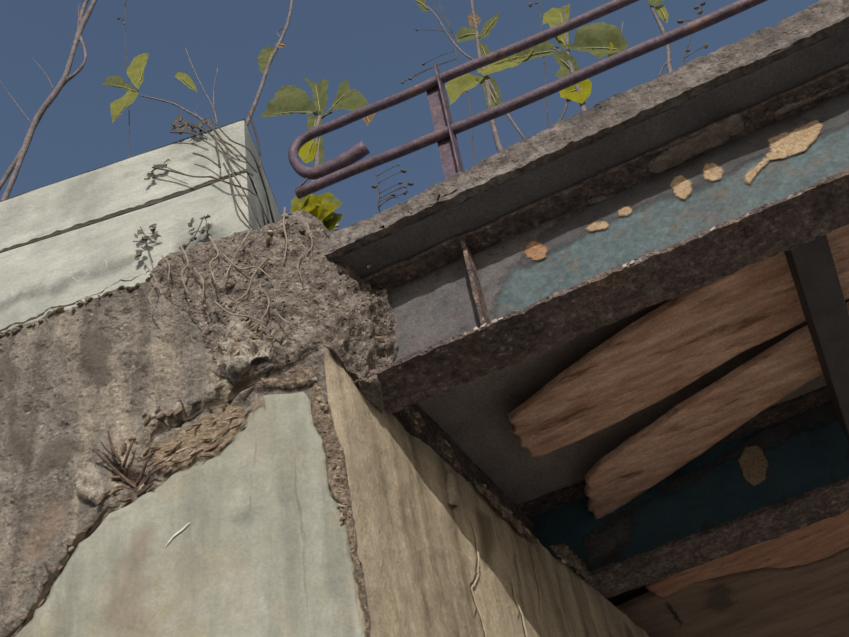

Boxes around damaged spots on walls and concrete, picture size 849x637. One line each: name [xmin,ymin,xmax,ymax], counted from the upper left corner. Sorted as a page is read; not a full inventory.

peeling [745,120,823,183]
spalling [92,401,251,506]
spalling [253,364,371,633]
crack [469,518,488,637]